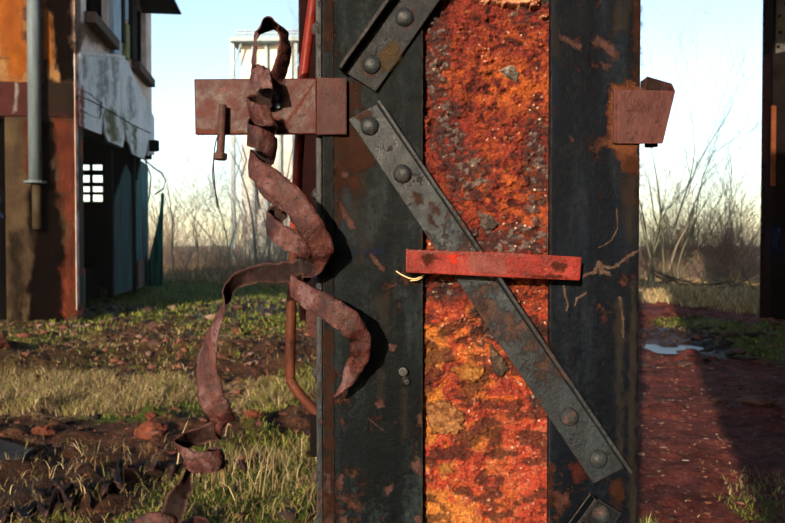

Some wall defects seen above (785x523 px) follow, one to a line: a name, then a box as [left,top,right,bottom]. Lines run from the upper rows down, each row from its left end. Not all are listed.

rust [0,0,27,81]
rust [40,0,53,79]
spalling [476,0,549,20]
leakage [7,0,108,323]
rust [53,86,85,318]
leakage [104,108,137,150]
rust [275,79,316,135]
rust [414,193,440,227]
rust [607,0,643,206]
rust [322,330,336,523]